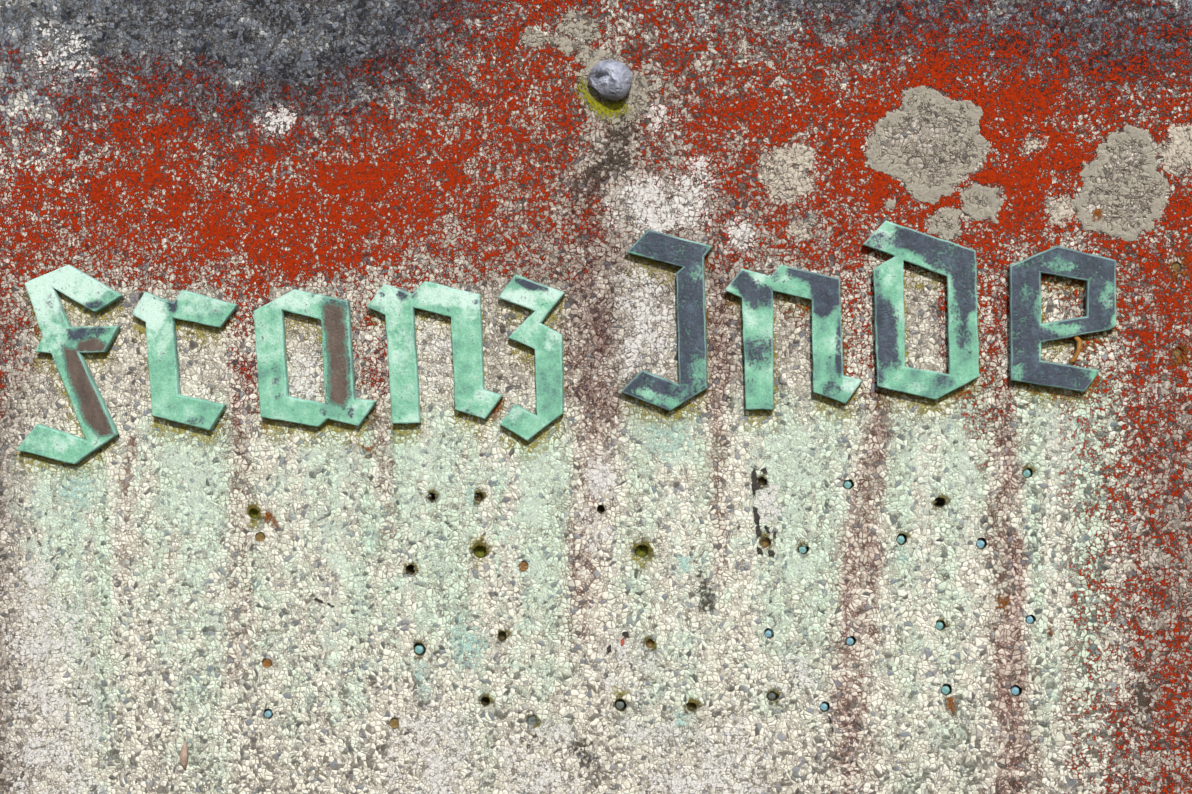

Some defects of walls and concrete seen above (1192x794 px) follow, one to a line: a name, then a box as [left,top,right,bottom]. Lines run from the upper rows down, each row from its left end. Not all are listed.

water stain [1041,274,1086,324]
water stain [1041,329,1118,361]
water stain [599,248,988,794]
water stain [1012,374,1100,589]